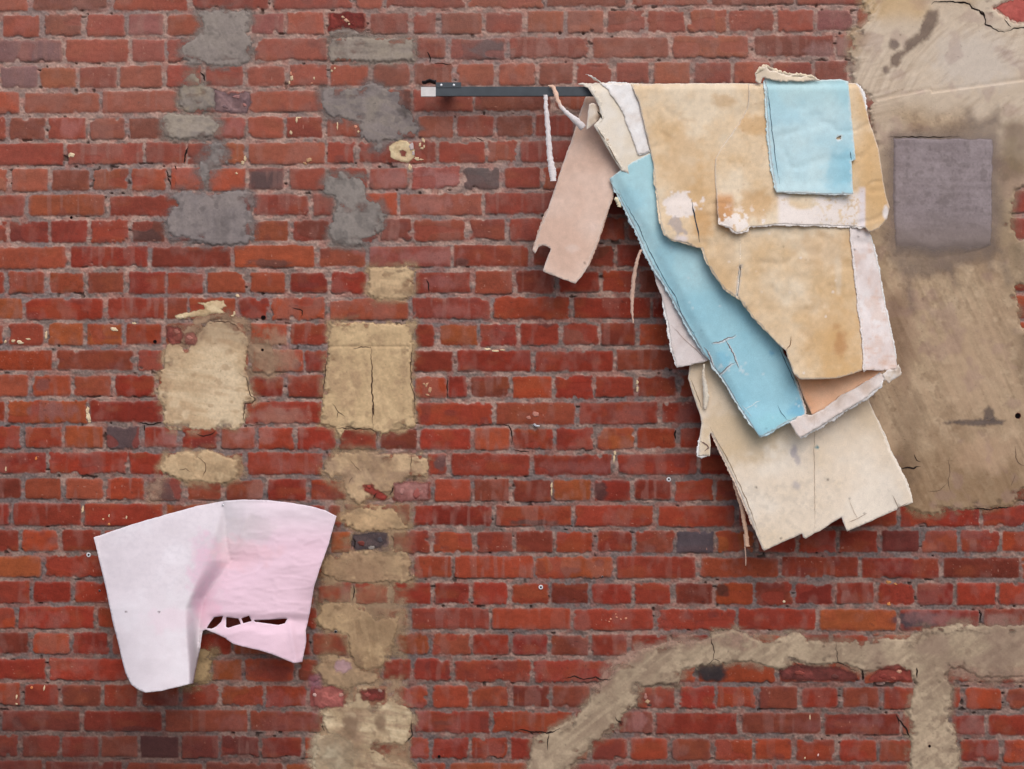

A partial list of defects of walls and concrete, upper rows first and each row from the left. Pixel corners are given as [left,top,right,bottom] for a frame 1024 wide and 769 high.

crack [934,1,1024,32]
flaking render [994,0,1024,22]
damp [884,11,937,72]
peeling [166,294,239,345]
spalling [883,365,902,383]
crack [323,346,378,438]
spalling [363,481,429,502]
spalling [351,532,387,550]
spalling [779,664,911,682]
spalling [313,686,344,708]
spalling [361,689,385,701]